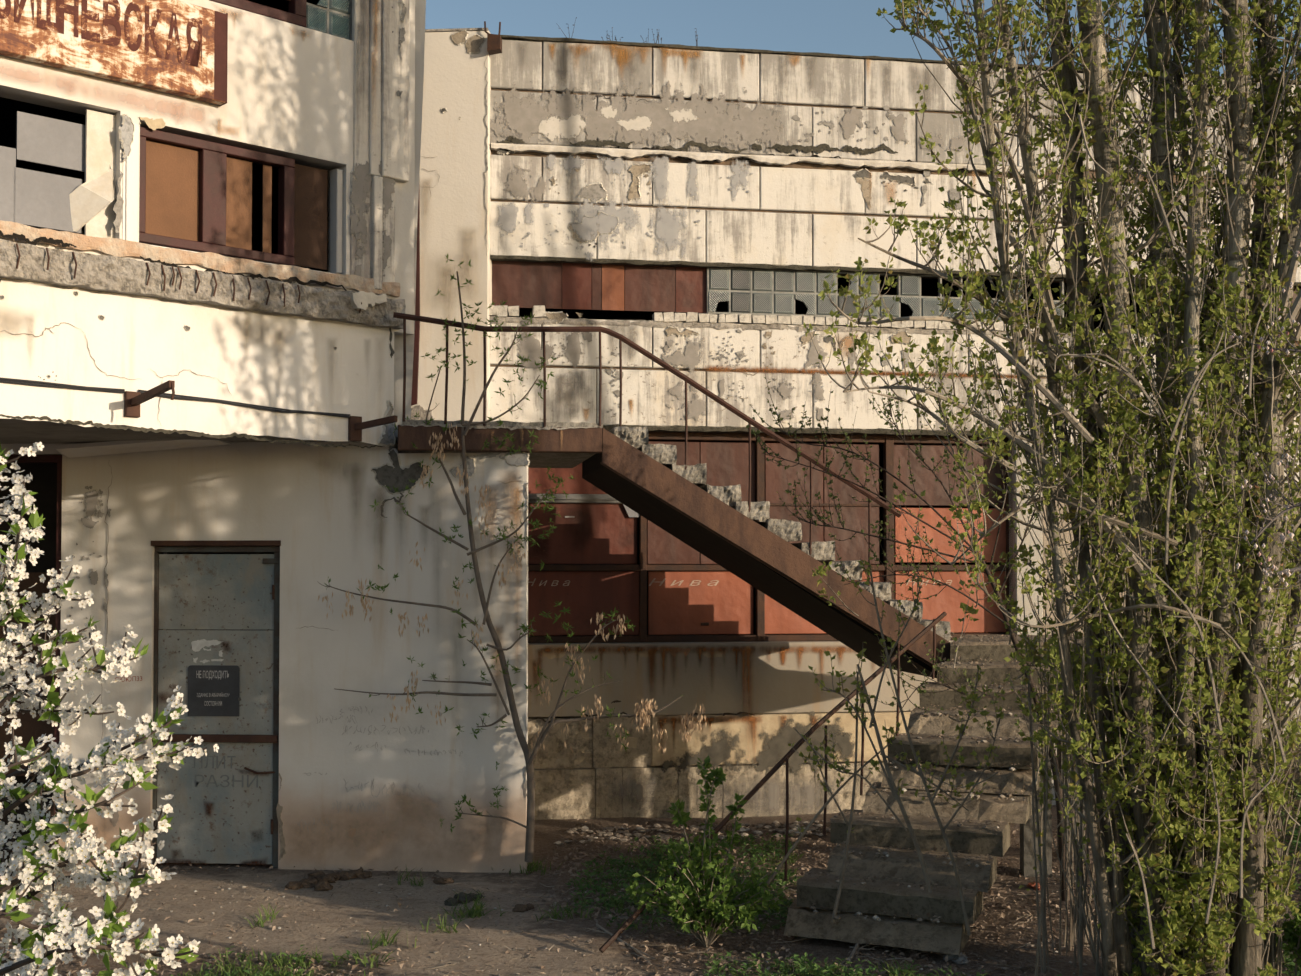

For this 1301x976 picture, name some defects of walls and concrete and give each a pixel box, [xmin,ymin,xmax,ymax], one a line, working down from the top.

rust [0,67,40,82]
rust [120,94,202,120]
peeling [350,161,395,277]
peeling [490,80,966,261]
spalling [146,262,301,307]
crack [0,322,231,424]
peeling [517,311,592,369]
peeling [661,326,859,422]
spalling [0,347,624,518]
peeling [71,486,111,614]
rust [533,647,854,742]
damp [661,711,855,812]